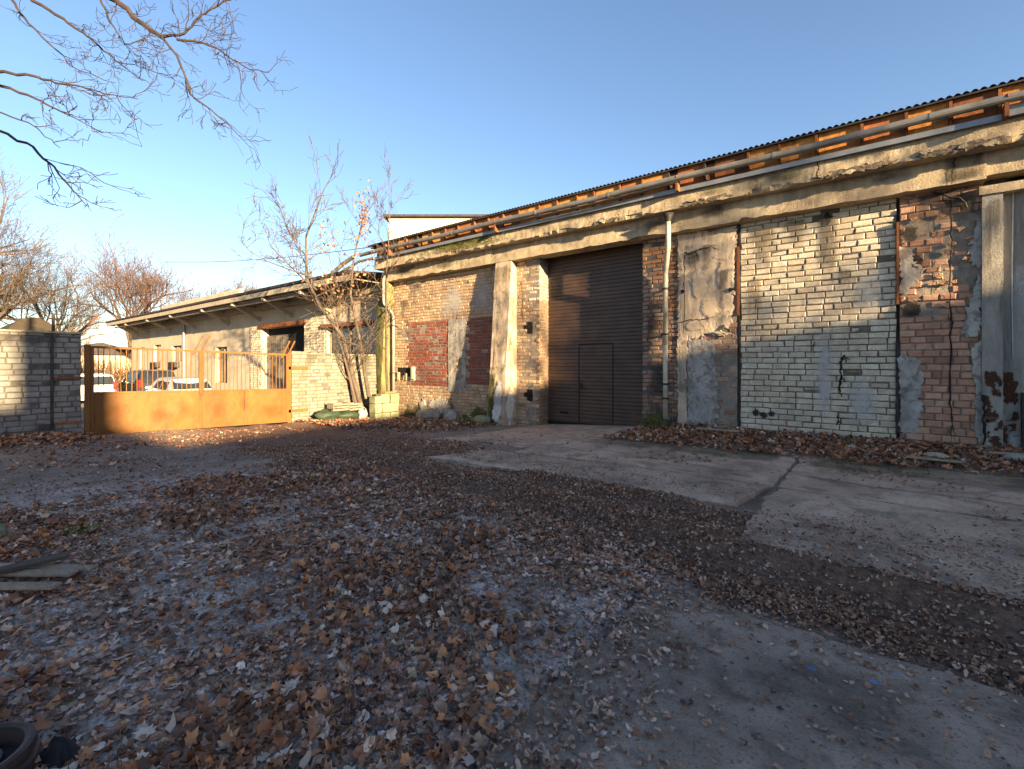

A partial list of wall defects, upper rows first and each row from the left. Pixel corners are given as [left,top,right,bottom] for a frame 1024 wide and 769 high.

peeling [676,226,737,427]
peeling [899,216,957,317]
crack [948,158,956,446]
peeling [940,218,982,442]
crack [836,355,850,425]
peeling [897,353,925,436]
corrosion [985,371,1019,448]